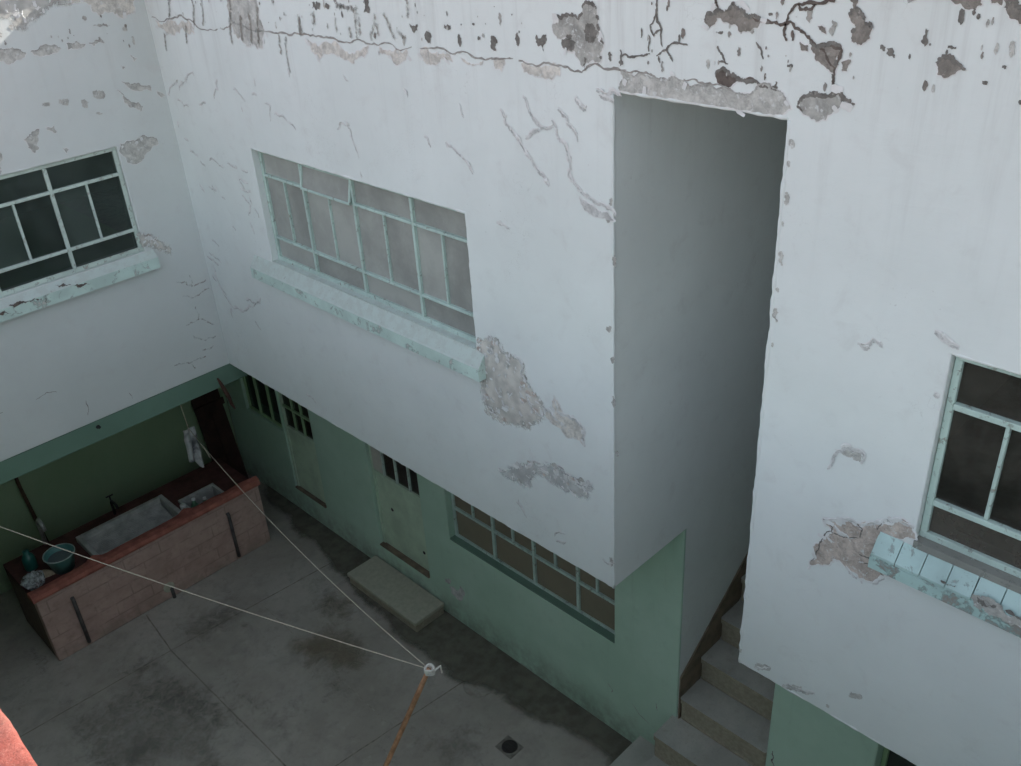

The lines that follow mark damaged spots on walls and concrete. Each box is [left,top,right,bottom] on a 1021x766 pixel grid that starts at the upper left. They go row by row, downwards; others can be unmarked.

flaking render [949,0,1021,27]
crack [152,0,731,89]
flaking render [618,0,895,123]
crack [752,0,843,111]
flaking render [922,45,966,93]
peeling [980,41,1015,69]
peeling [23,125,57,154]
peeling [119,135,159,165]
peeling [477,335,586,447]
peeling [497,461,593,497]
peeling [807,516,918,584]
flaking render [970,594,1021,628]